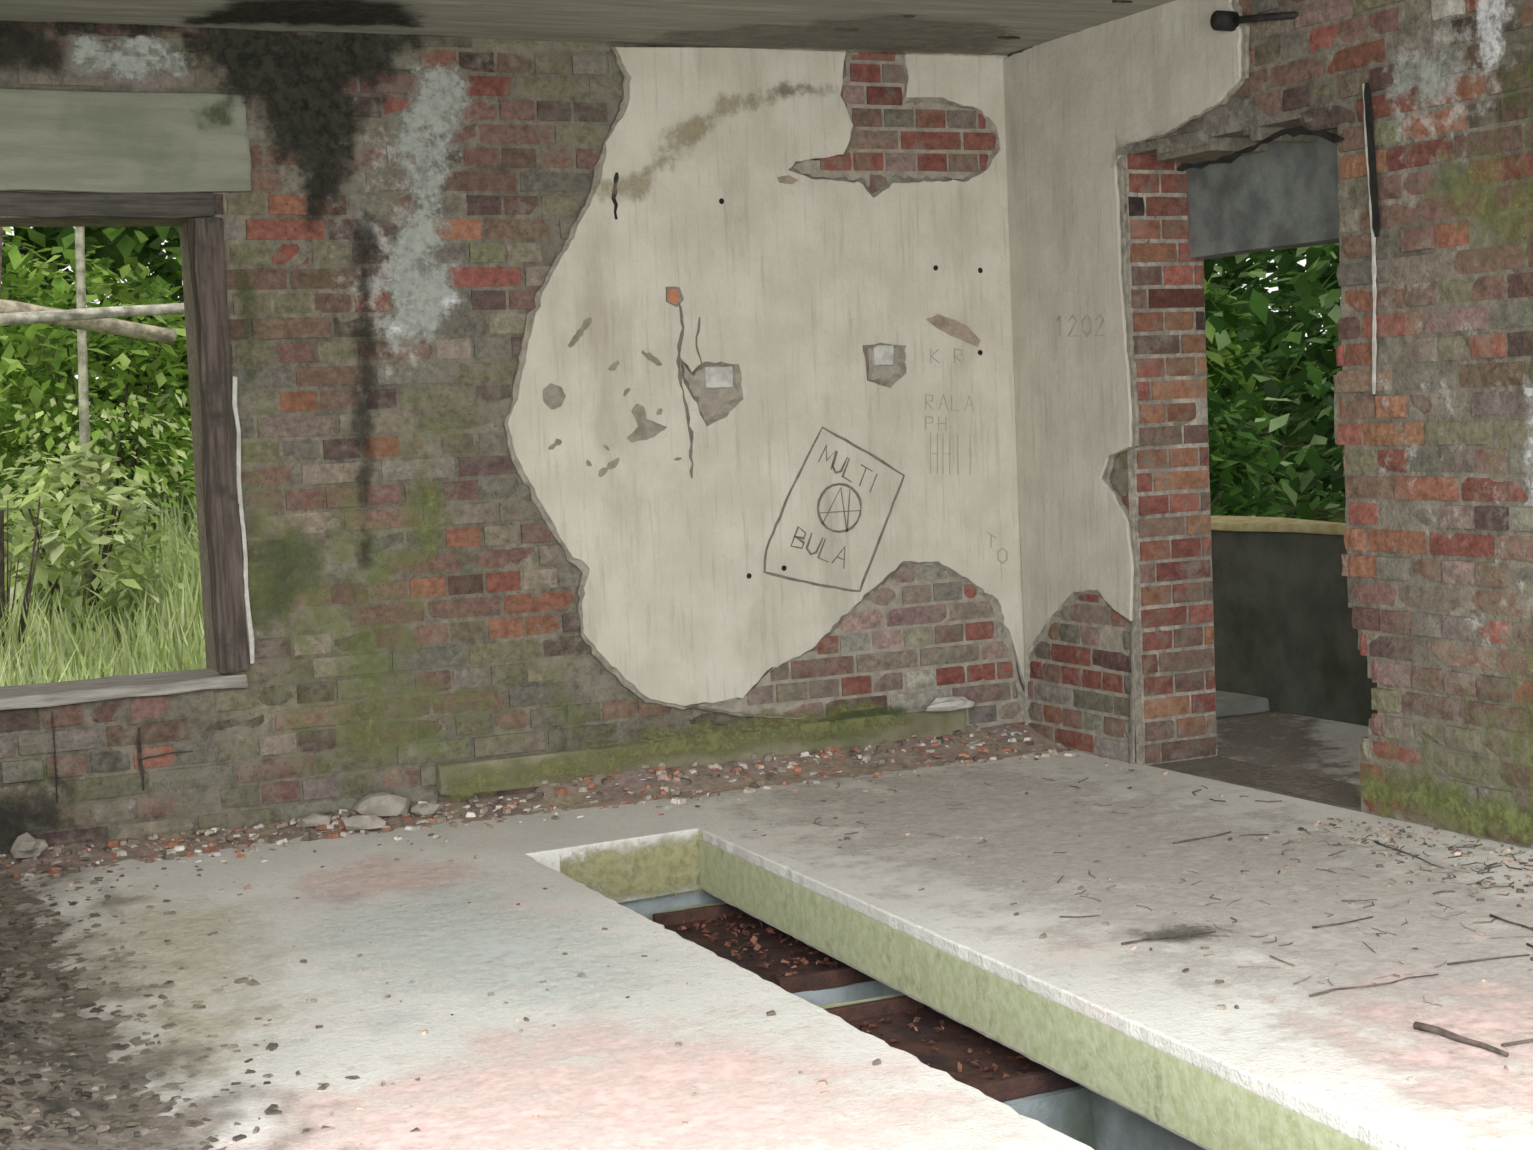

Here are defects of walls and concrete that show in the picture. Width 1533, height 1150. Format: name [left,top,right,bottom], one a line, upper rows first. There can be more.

damp [0,0,423,216]
flaking render [789,50,999,198]
damp [353,215,377,500]
flaking render [567,317,592,348]
flaking render [586,445,620,477]
flaking render [641,350,662,366]
crack [676,302,702,478]
flaking render [685,561,1136,764]